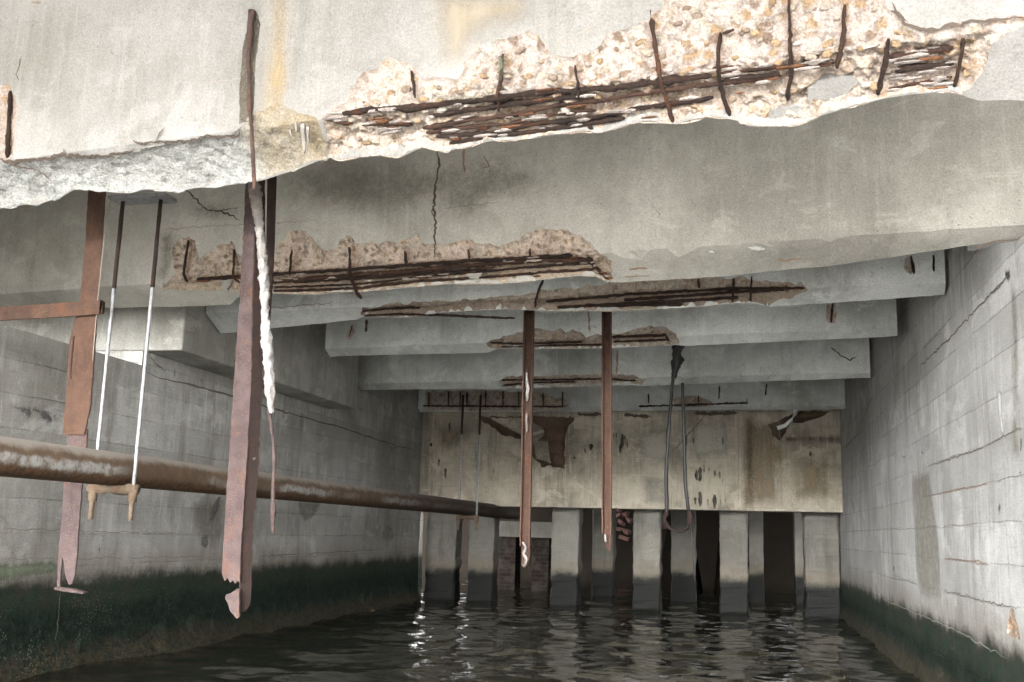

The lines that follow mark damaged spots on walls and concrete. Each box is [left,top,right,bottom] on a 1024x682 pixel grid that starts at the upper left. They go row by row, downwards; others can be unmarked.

spalling [0,0,1024,209]
crack [163,190,309,230]
crack [431,149,505,256]
spalling [159,237,242,298]
water stain [248,181,276,414]
spalling [272,229,808,332]
spalling [486,326,680,349]
crack [919,275,1008,380]
spalling [423,374,748,469]
spalling [768,410,830,440]